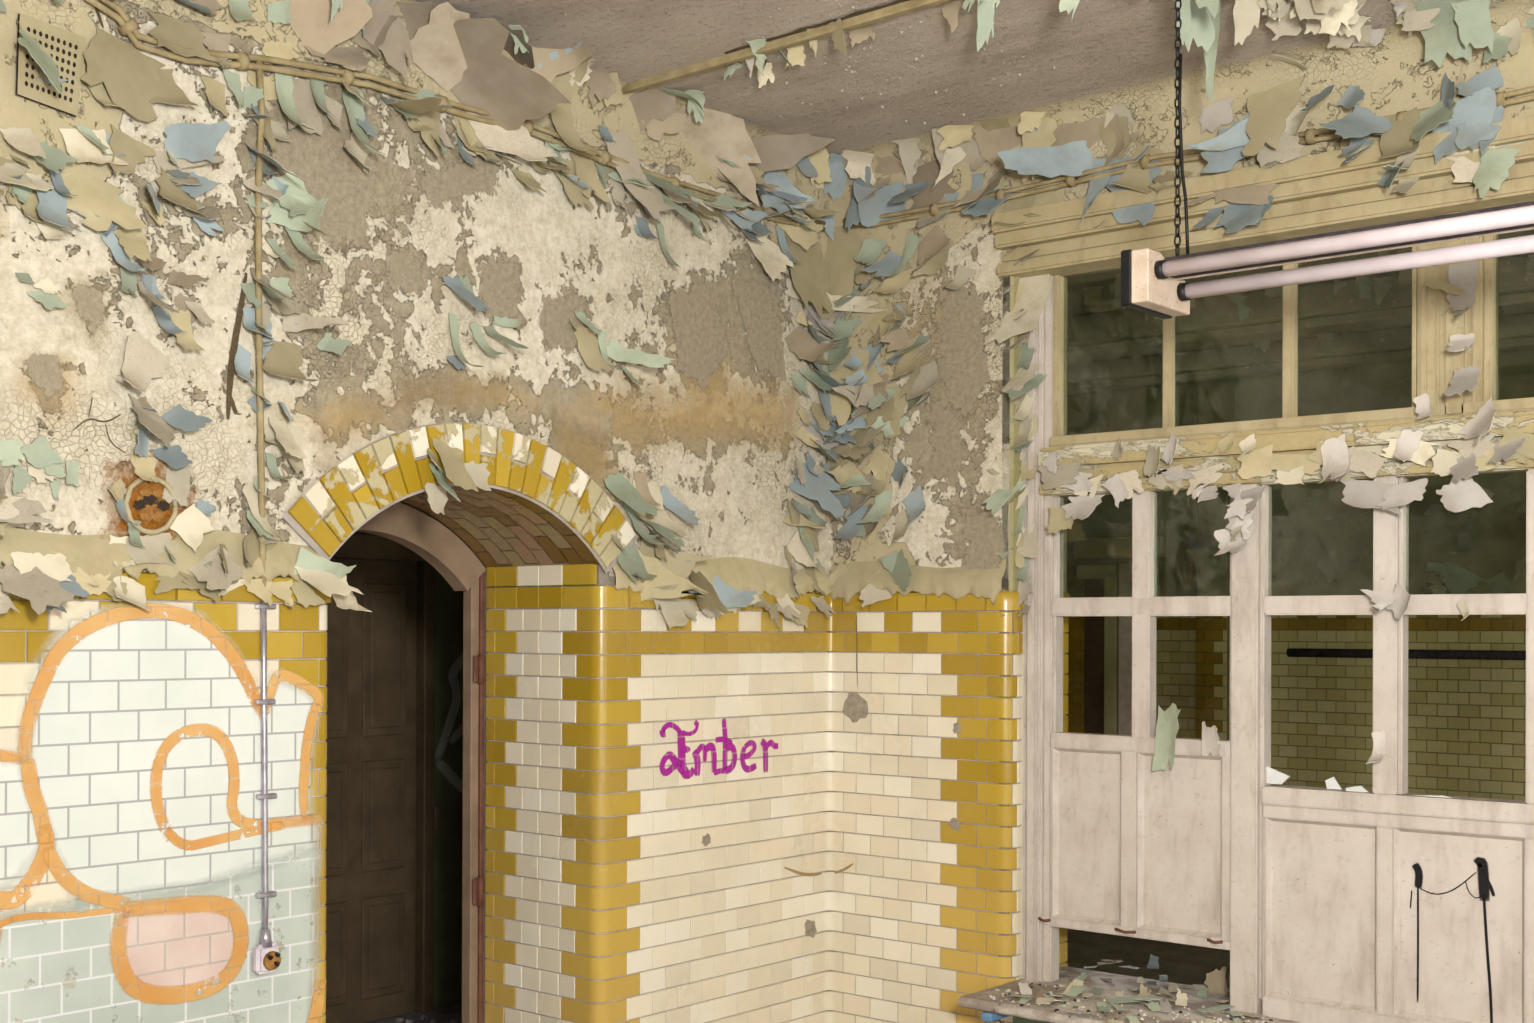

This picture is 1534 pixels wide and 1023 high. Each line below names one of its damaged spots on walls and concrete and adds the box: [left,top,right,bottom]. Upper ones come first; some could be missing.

rust [109,462,191,538]
spalling [842,692,868,723]
peeling [1152,703,1181,771]
peeling [1202,721,1221,757]
peeling [1365,730,1385,764]